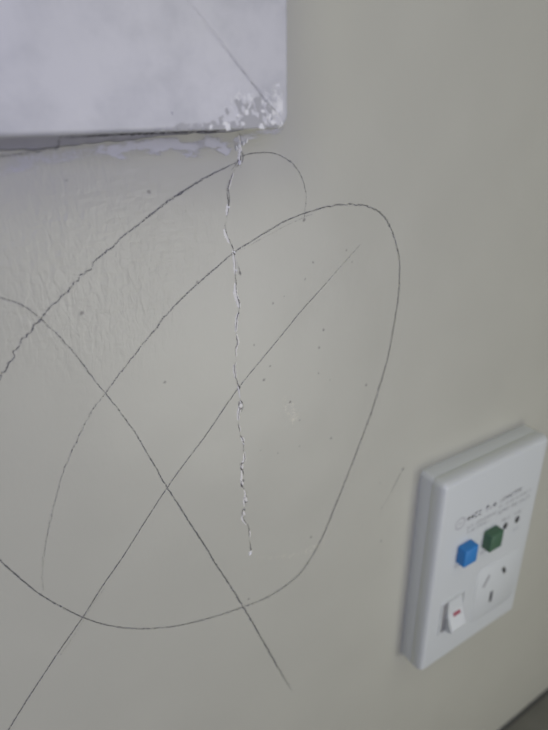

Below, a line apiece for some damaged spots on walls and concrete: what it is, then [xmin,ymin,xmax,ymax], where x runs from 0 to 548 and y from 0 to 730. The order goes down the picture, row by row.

crack [223,134,252,555]